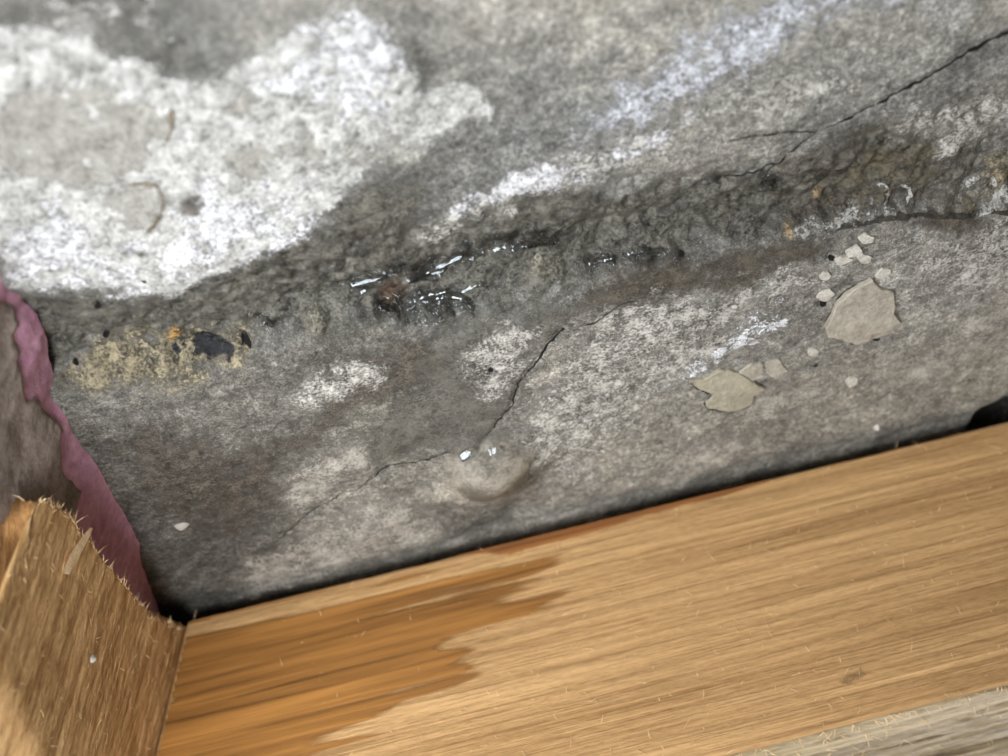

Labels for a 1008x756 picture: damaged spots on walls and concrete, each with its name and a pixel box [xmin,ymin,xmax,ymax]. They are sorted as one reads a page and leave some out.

crack [715,31,1008,188]
leakage [0,0,1008,538]
peeling [816,232,901,345]
crack [482,301,636,442]
peeling [688,358,788,413]
crack [264,452,455,545]
leakage [190,432,771,622]
leakage [158,557,566,756]